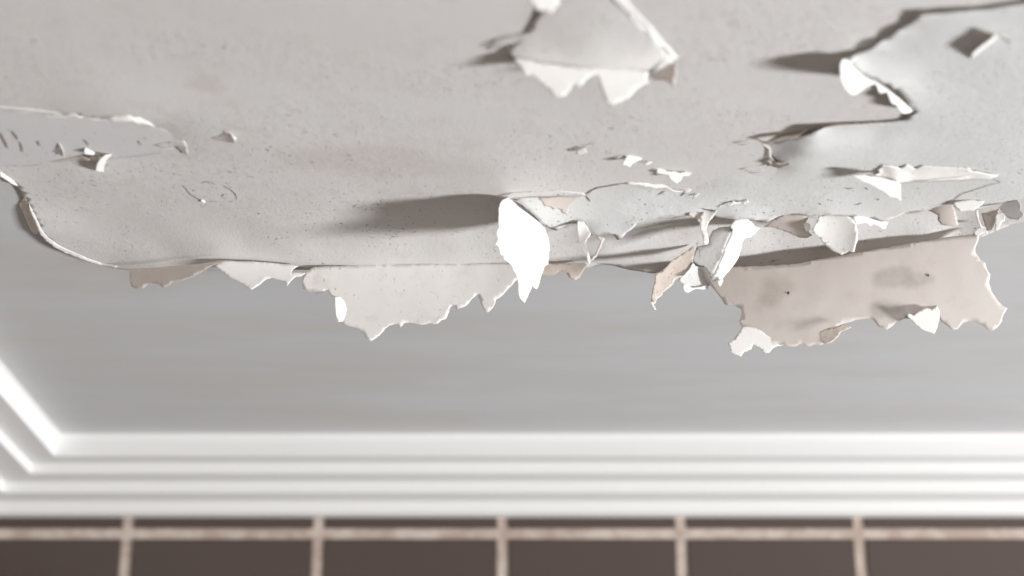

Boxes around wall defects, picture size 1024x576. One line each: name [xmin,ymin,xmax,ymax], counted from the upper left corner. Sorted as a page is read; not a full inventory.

peeling [0,0,1024,356]